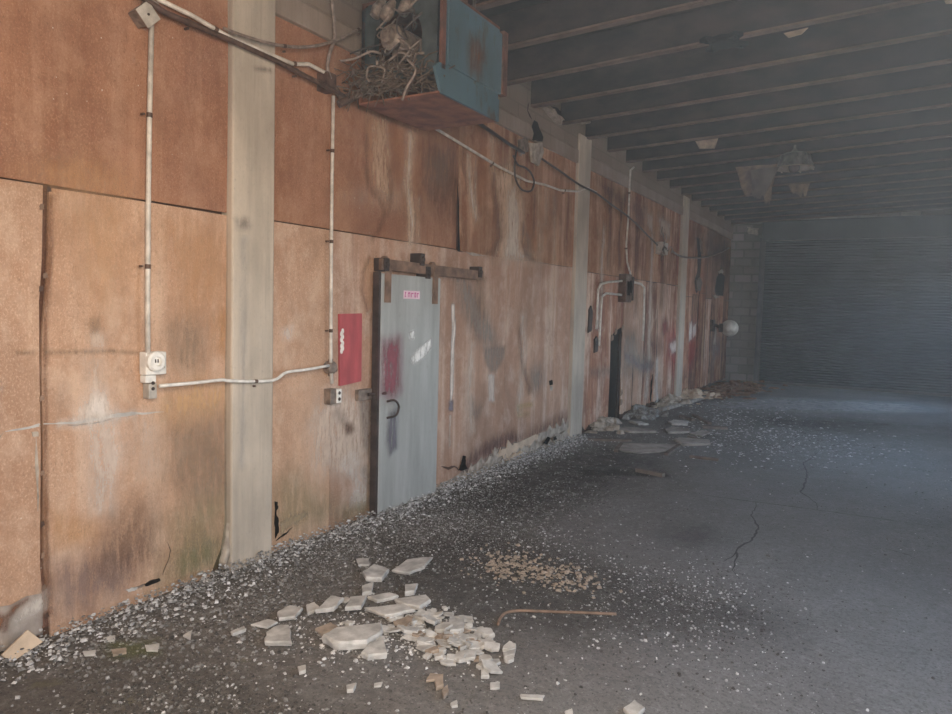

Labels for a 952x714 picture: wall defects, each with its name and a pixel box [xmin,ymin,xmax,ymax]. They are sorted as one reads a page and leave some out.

water stain [495,164,541,260]
crack [723,505,759,579]